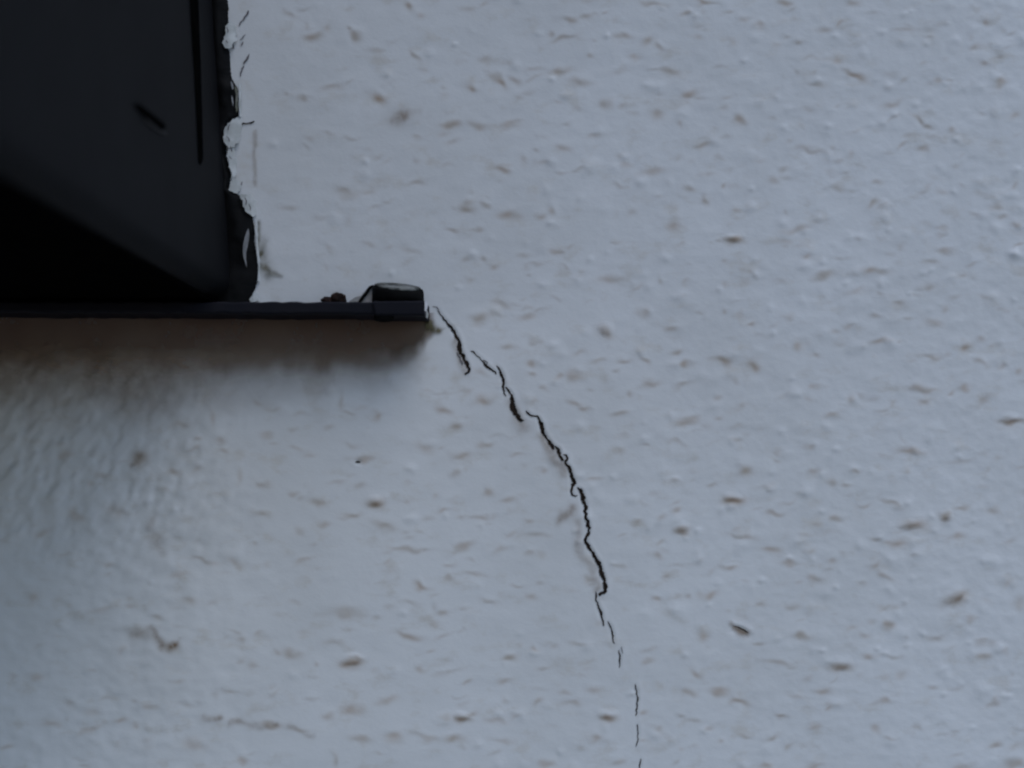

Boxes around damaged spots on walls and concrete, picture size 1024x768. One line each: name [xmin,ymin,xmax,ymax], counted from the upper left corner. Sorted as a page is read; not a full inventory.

crack [432,306,641,768]